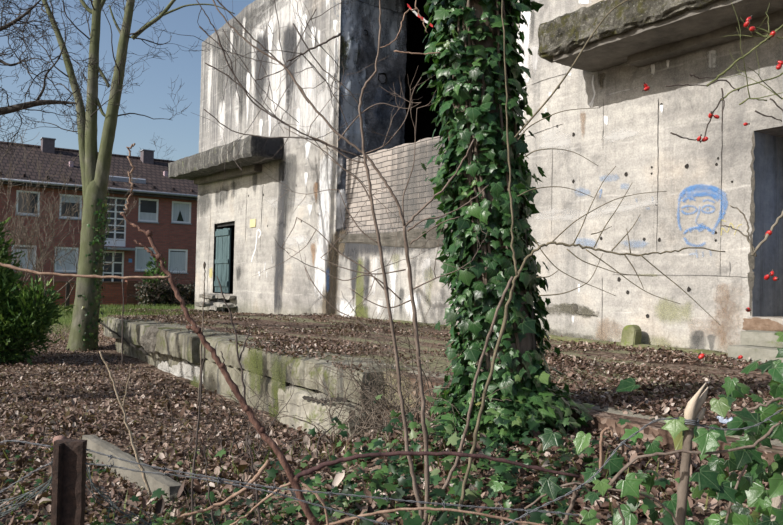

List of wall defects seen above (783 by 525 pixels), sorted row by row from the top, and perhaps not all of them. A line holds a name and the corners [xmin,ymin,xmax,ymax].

leakage [207,0,339,158]
leakage [268,152,440,319]
leakage [394,139,448,230]
crack [302,386,348,404]